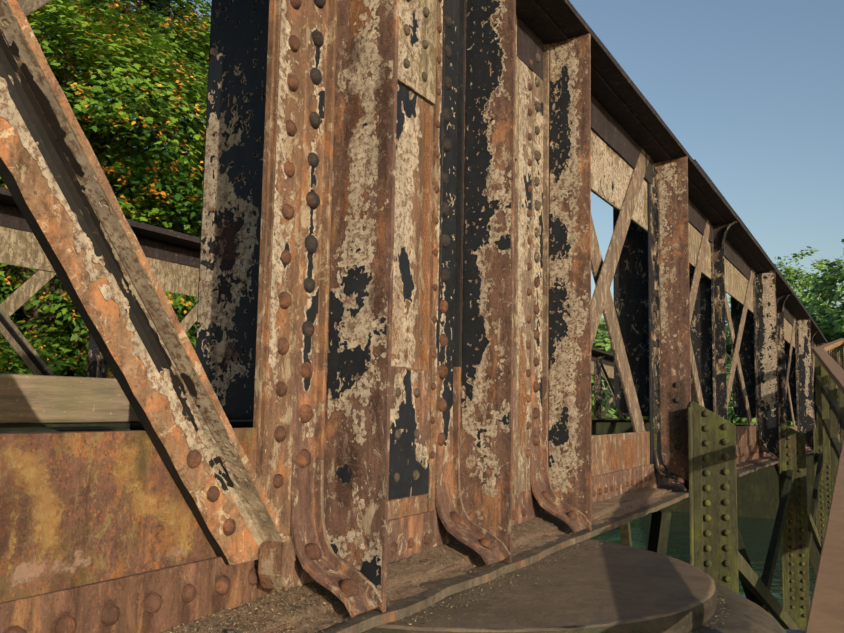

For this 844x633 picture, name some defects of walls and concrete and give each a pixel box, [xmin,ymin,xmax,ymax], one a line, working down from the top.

peeling [309,12,326,70]
peeling [311,82,325,154]
peeling [0,0,269,507]
peeling [268,0,301,404]
peeling [298,247,319,394]
peeling [326,0,633,595]
peeling [632,180,647,229]
peeling [659,162,688,354]
peeling [758,273,779,452]
peeling [798,320,813,445]
corrosion [4,451,62,566]
corrosion [115,449,191,556]